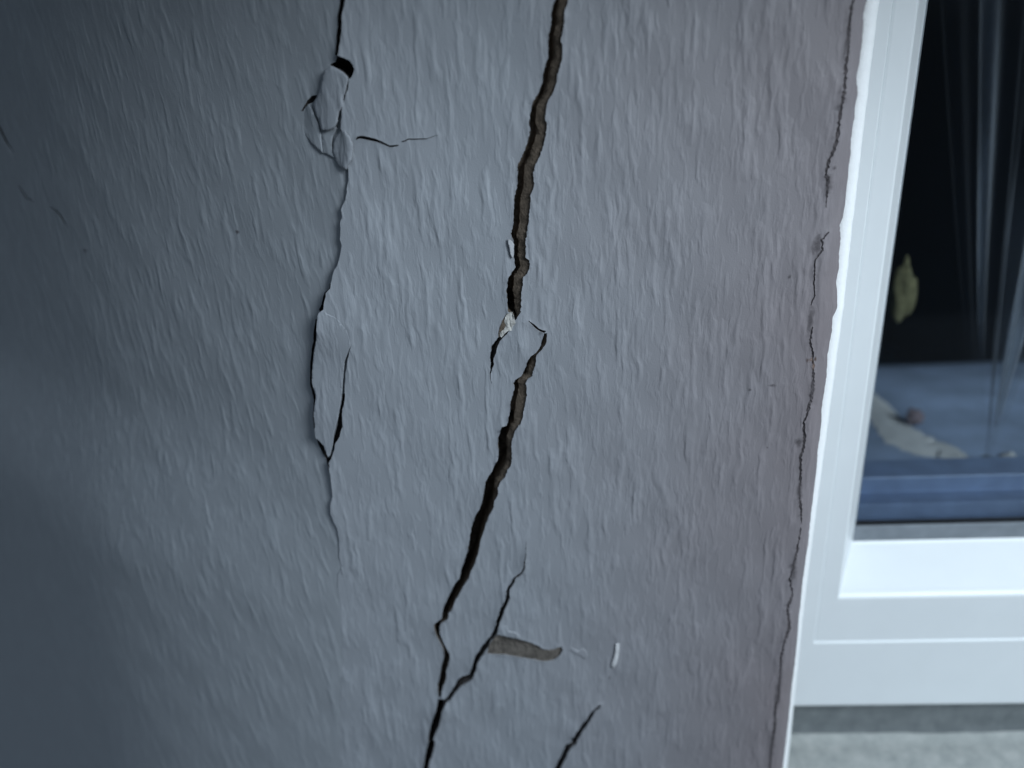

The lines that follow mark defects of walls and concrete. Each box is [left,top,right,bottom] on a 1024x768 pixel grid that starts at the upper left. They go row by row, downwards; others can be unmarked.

peeling [301,66,353,169]
crack [356,135,438,147]
crack [824,0,855,205]
peeling [312,310,351,457]
crack [423,0,568,768]
crack [769,232,829,768]
spalling [487,626,588,662]
crack [555,705,601,768]